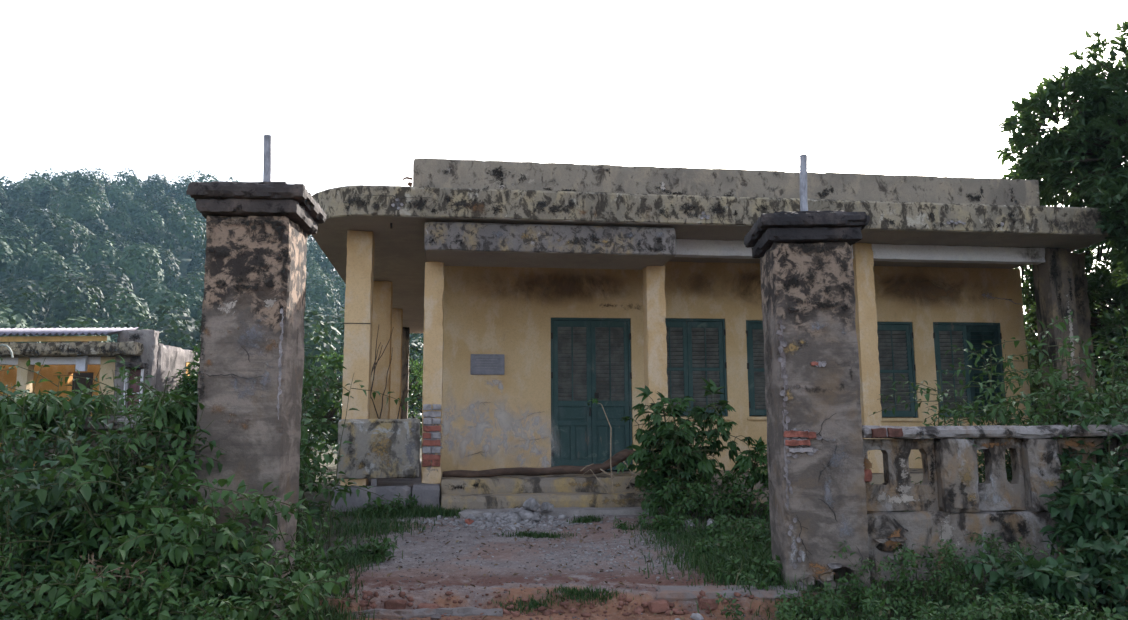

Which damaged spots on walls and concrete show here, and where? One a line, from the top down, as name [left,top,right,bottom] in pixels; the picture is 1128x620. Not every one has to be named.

leakage [344,197,379,215]
mould [407,166,529,215]
mould [534,188,579,214]
mould [656,185,738,219]
mould [208,217,289,292]
leakage [566,233,599,248]
leakage [779,243,852,330]
flaking render [420,404,444,476]
flaking render [776,319,862,590]
flaking render [874,529,915,560]